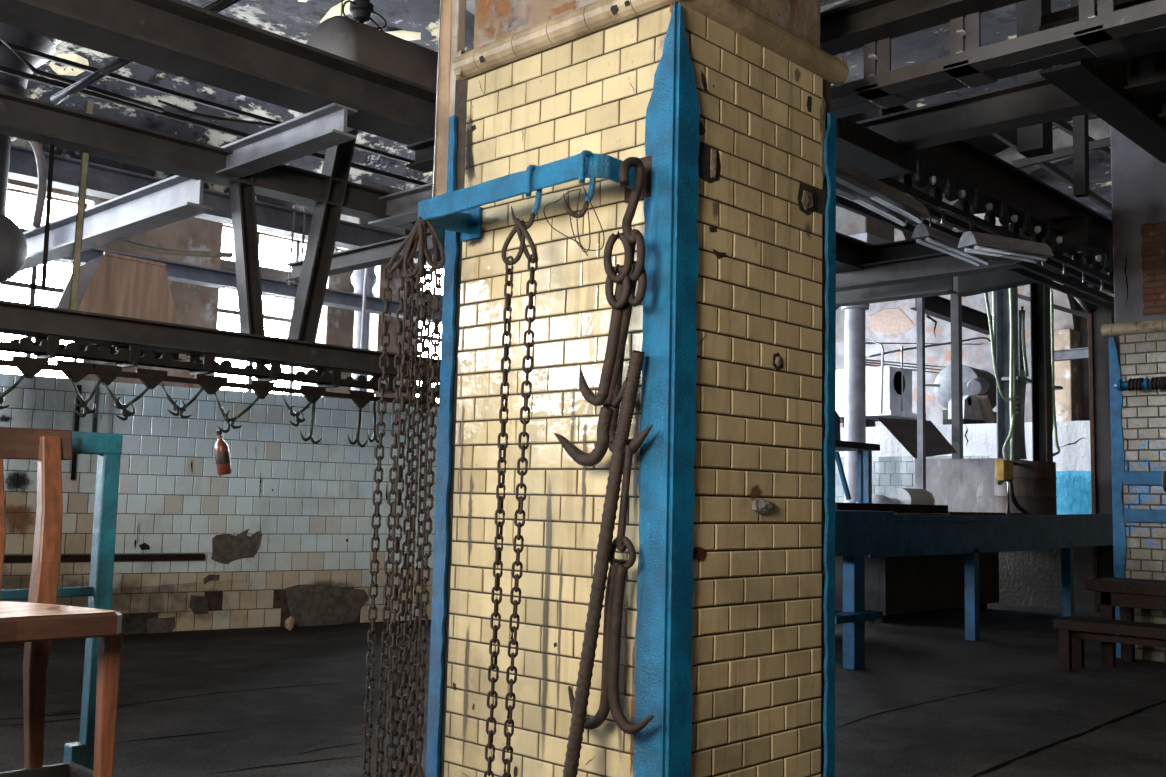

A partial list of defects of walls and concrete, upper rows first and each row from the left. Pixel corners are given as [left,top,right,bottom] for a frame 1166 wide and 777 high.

peeling [320,0,354,23]
peeling [49,54,89,76]
flaking render [1141,221,1166,316]
damp [459,408,473,553]
spalling [189,529,262,615]
damp [542,495,562,734]
damp [618,582,636,776]